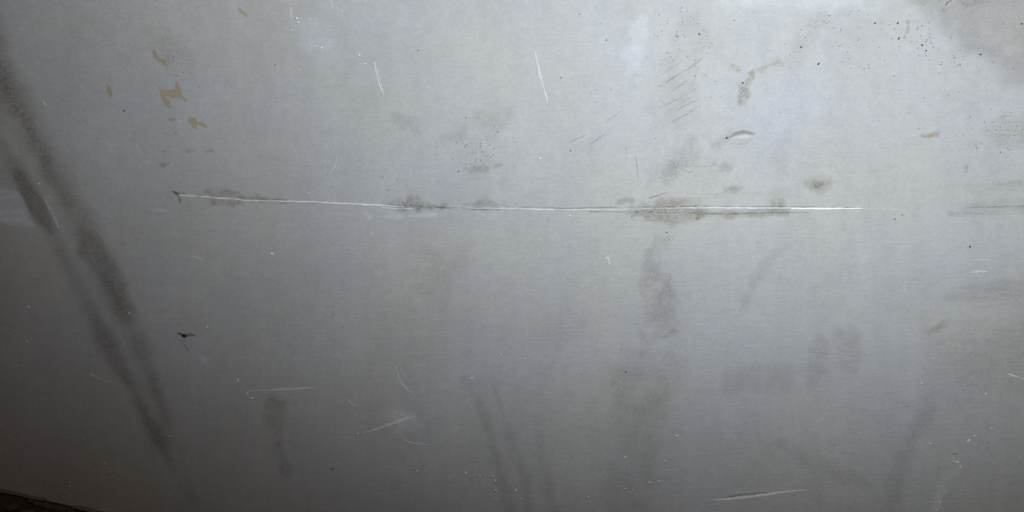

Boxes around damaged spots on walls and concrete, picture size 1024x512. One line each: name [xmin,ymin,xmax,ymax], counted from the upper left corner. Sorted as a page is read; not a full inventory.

peeling [154,47,207,133]
crack [179,195,411,210]
crack [453,205,643,213]
crack [668,204,863,212]